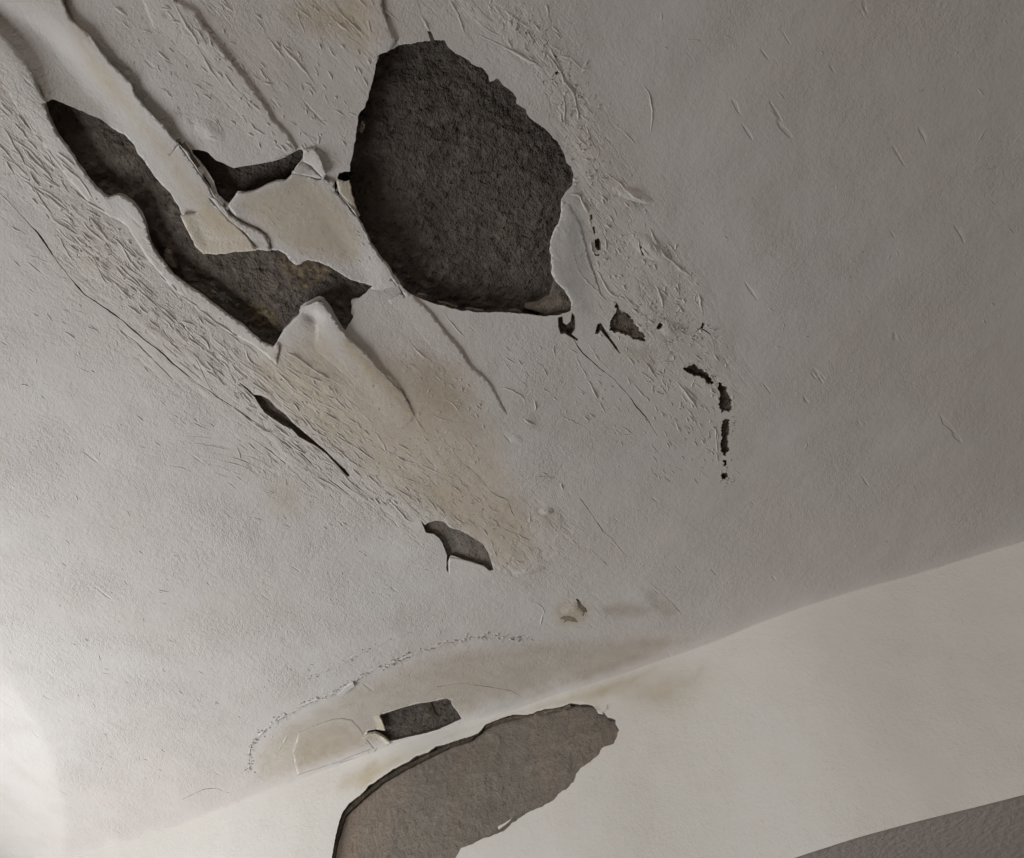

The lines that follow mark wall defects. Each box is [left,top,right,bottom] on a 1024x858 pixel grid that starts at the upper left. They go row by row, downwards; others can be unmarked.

crack [0,193,348,494]
flaking render [0,0,613,574]
flaking render [595,303,714,354]
peeling [292,699,461,775]
flaking render [332,703,619,858]